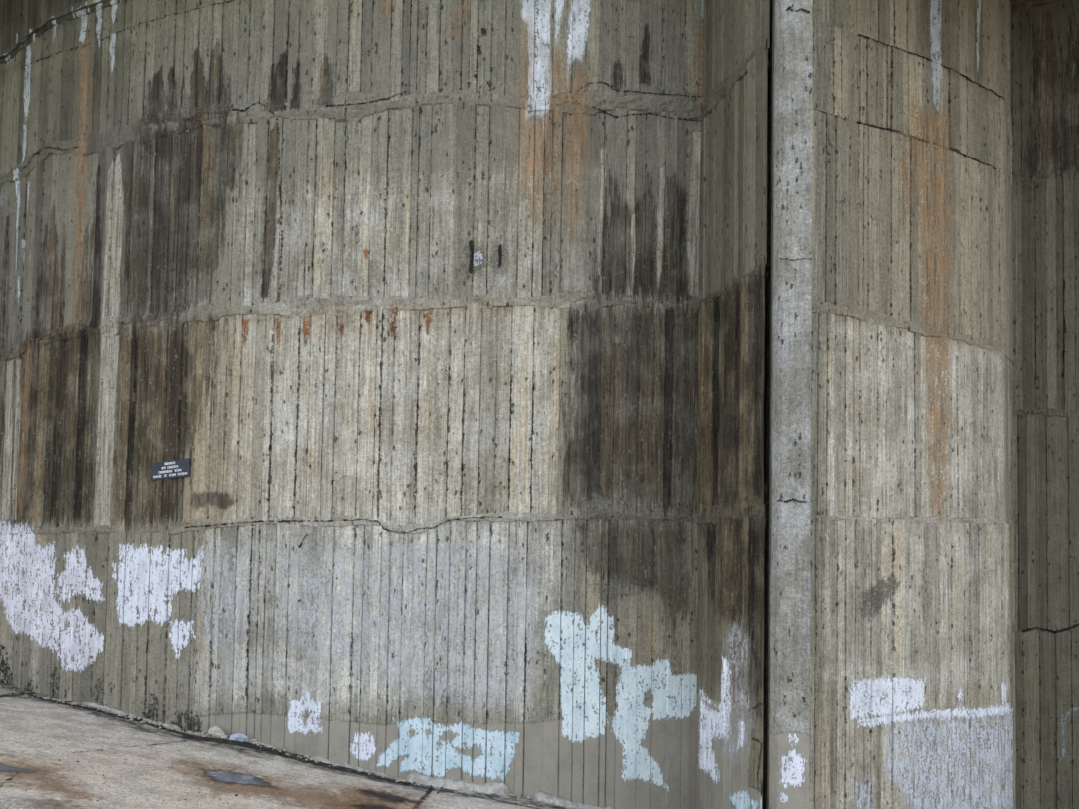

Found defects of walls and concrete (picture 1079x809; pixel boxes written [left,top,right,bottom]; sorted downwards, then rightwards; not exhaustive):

water stain [71,0,122,72]
water stain [264,52,300,112]
water stain [318,54,333,105]
water stain [521,0,592,141]
water stain [929,0,942,111]
water stain [1021,10,1079,181]
water stain [0,28,243,530]
water stain [261,125,279,298]
corrosion [903,113,952,509]
water stain [559,131,765,716]
crack [1022,623,1079,634]